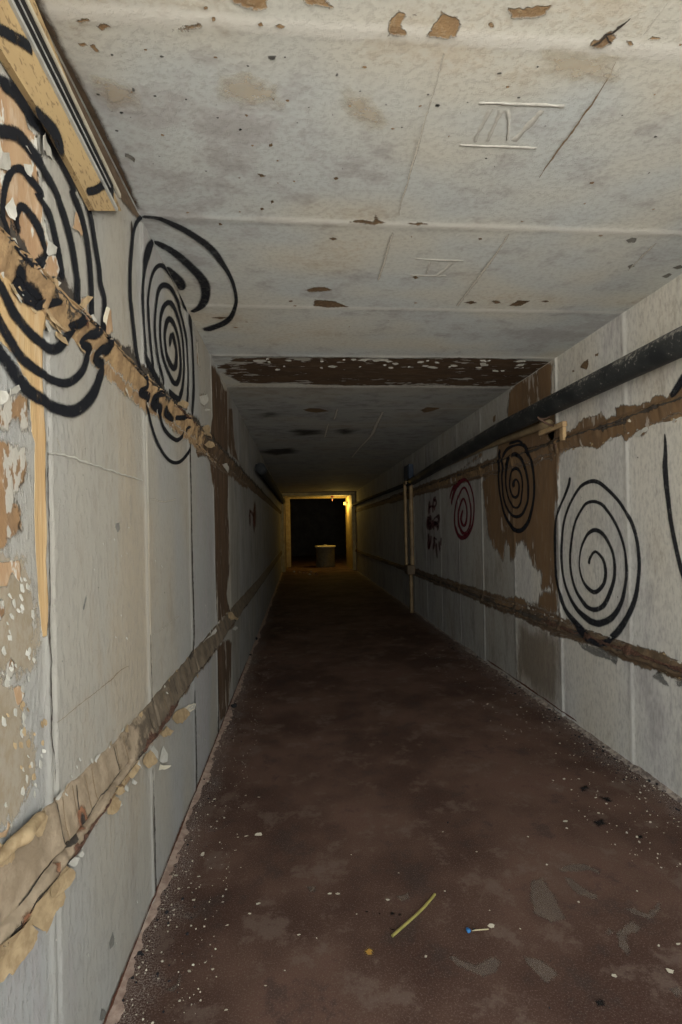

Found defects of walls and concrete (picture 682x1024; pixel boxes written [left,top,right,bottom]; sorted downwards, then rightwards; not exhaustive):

peeling [388,10,417,37]
peeling [426,11,461,39]
peeling [507,5,552,19]
crack [540,4,667,176]
peeling [590,31,633,49]
peeling [0,84,61,293]
peeling [79,295,113,340]
peeling [307,287,348,308]
peeling [0,272,86,638]
peeling [165,341,555,723]
peeling [482,388,682,681]
peeling [0,847,84,983]